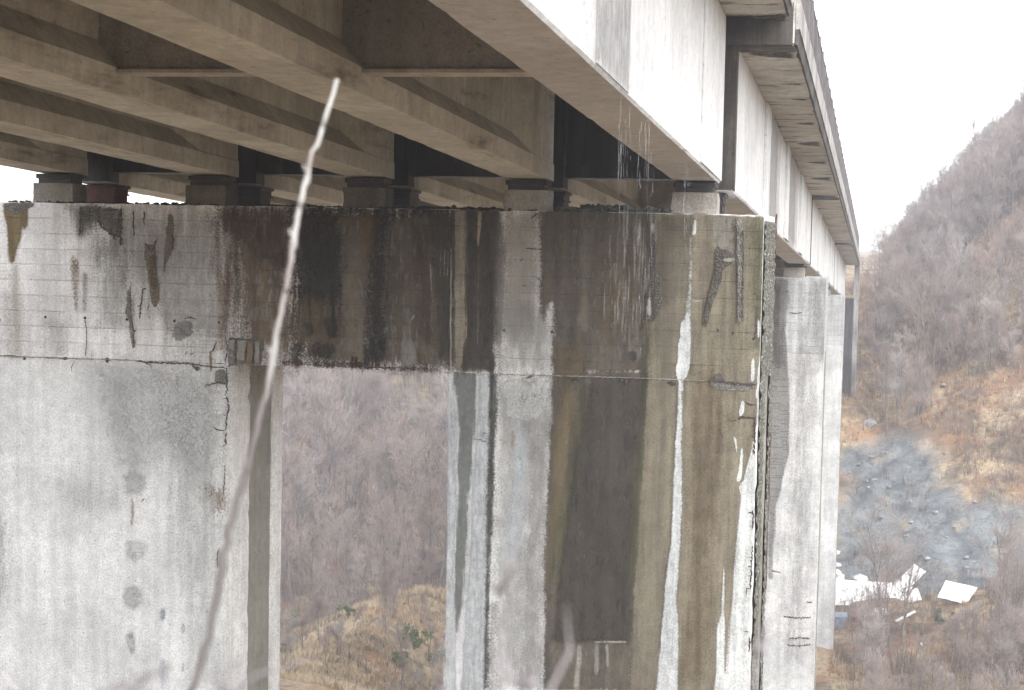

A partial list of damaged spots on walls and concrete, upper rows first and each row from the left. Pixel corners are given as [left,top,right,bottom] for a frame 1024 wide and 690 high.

spalling [204,337,263,395]
leakage [216,206,790,690]
spalling [703,214,778,690]